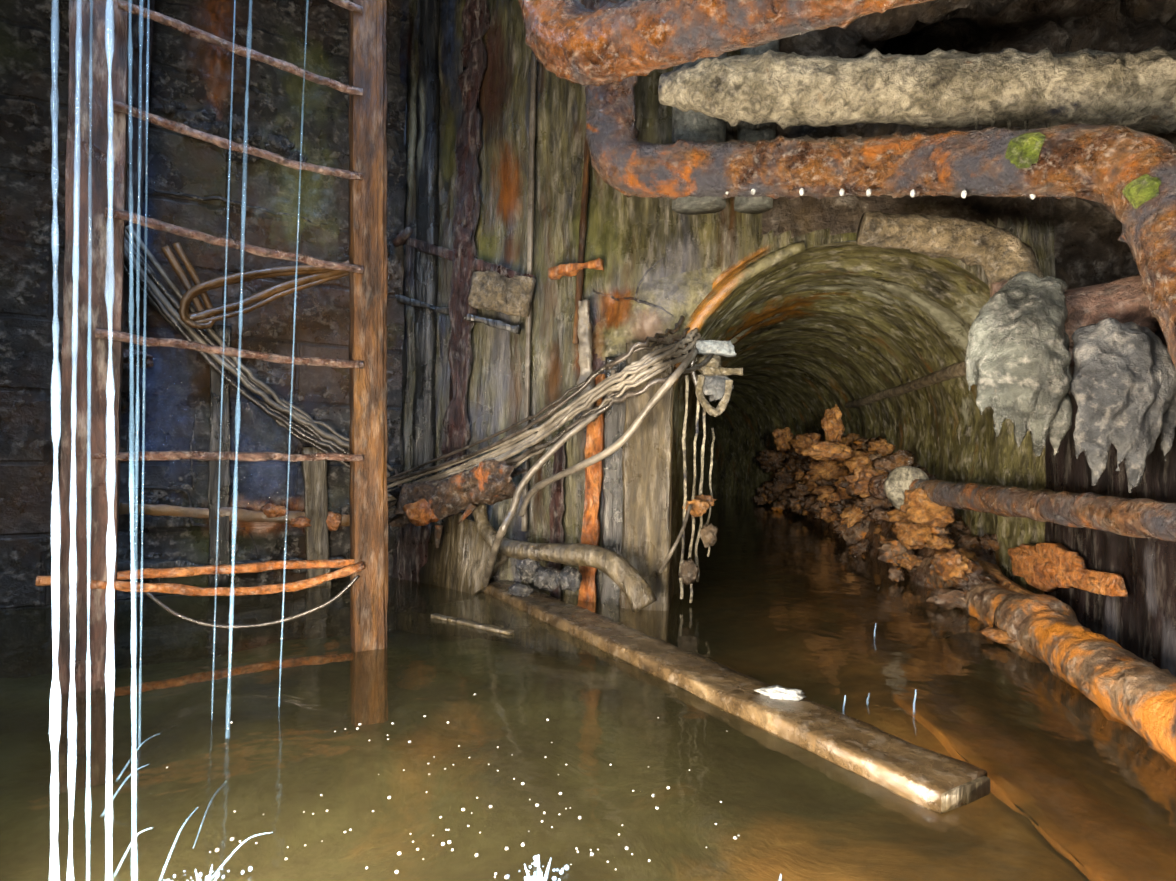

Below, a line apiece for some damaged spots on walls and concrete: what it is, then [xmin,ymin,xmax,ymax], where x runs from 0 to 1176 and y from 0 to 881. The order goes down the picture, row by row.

rust [673,249,765,385]
rust [727,300,812,345]
rust [581,343,605,546]
rust [538,442,566,544]
rust [549,586,561,601]
rust [577,566,597,613]
rust [1008,543,1128,597]
rust [979,627,1016,644]